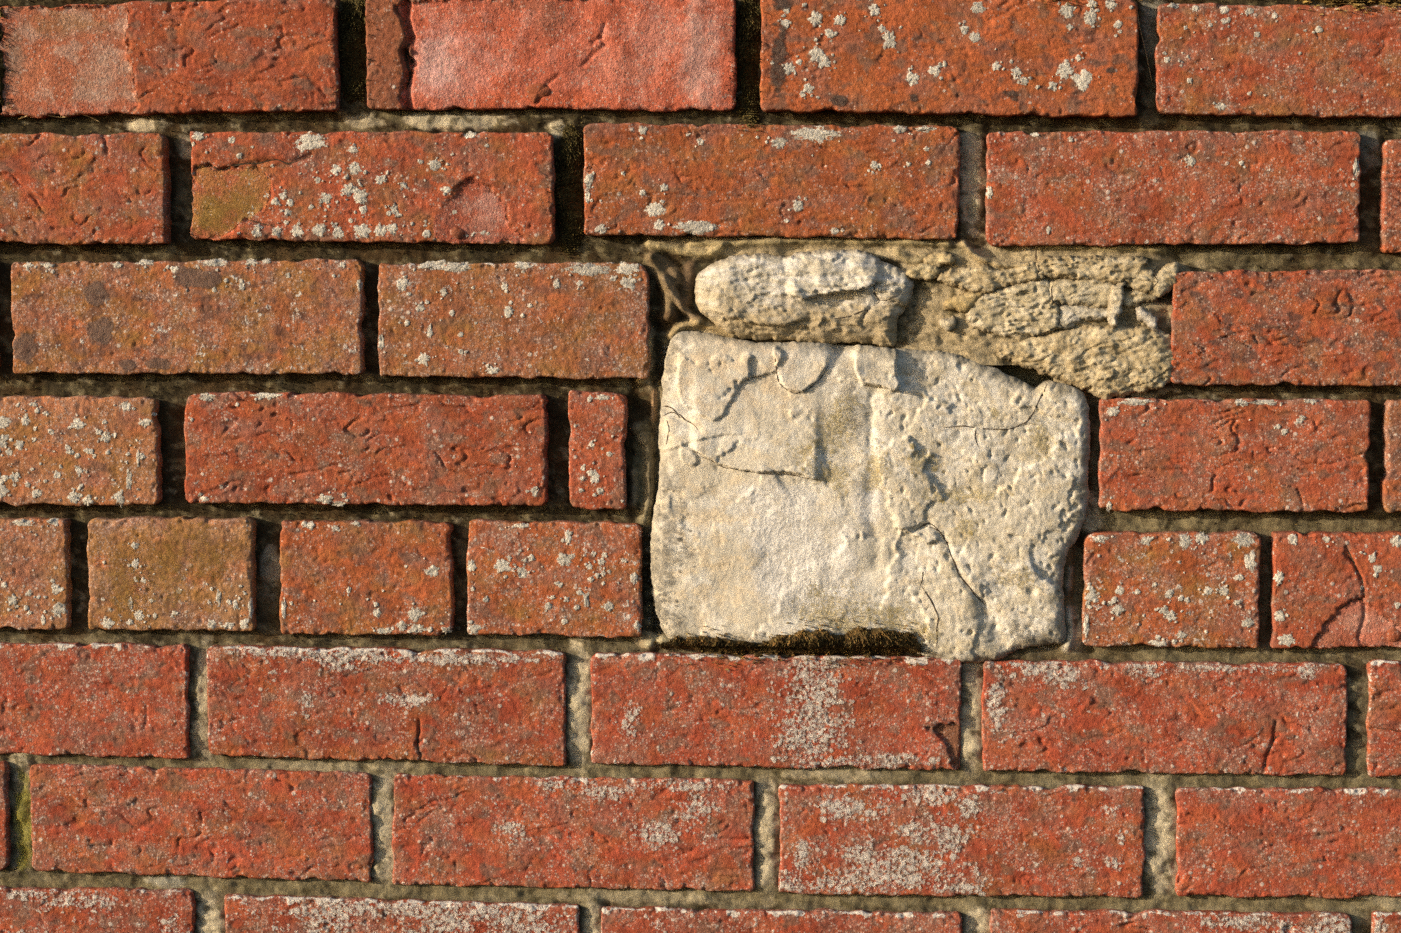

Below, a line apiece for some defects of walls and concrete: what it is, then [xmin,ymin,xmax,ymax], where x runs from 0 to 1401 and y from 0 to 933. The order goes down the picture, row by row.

crack [747,361,828,394]
crack [663,406,818,481]
crack [949,383,1048,447]
crack [914,523,984,647]
crack [1338,549,1365,609]